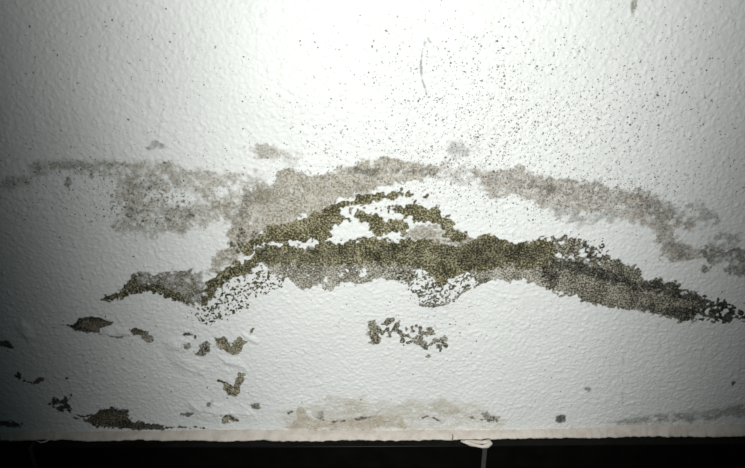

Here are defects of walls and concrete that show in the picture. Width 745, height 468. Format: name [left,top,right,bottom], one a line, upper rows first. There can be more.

damp [72,120,745,325]
peeling [67,317,113,333]
peeling [131,328,153,343]
peeling [183,333,247,356]
peeling [217,372,245,397]
peeling [48,394,205,431]